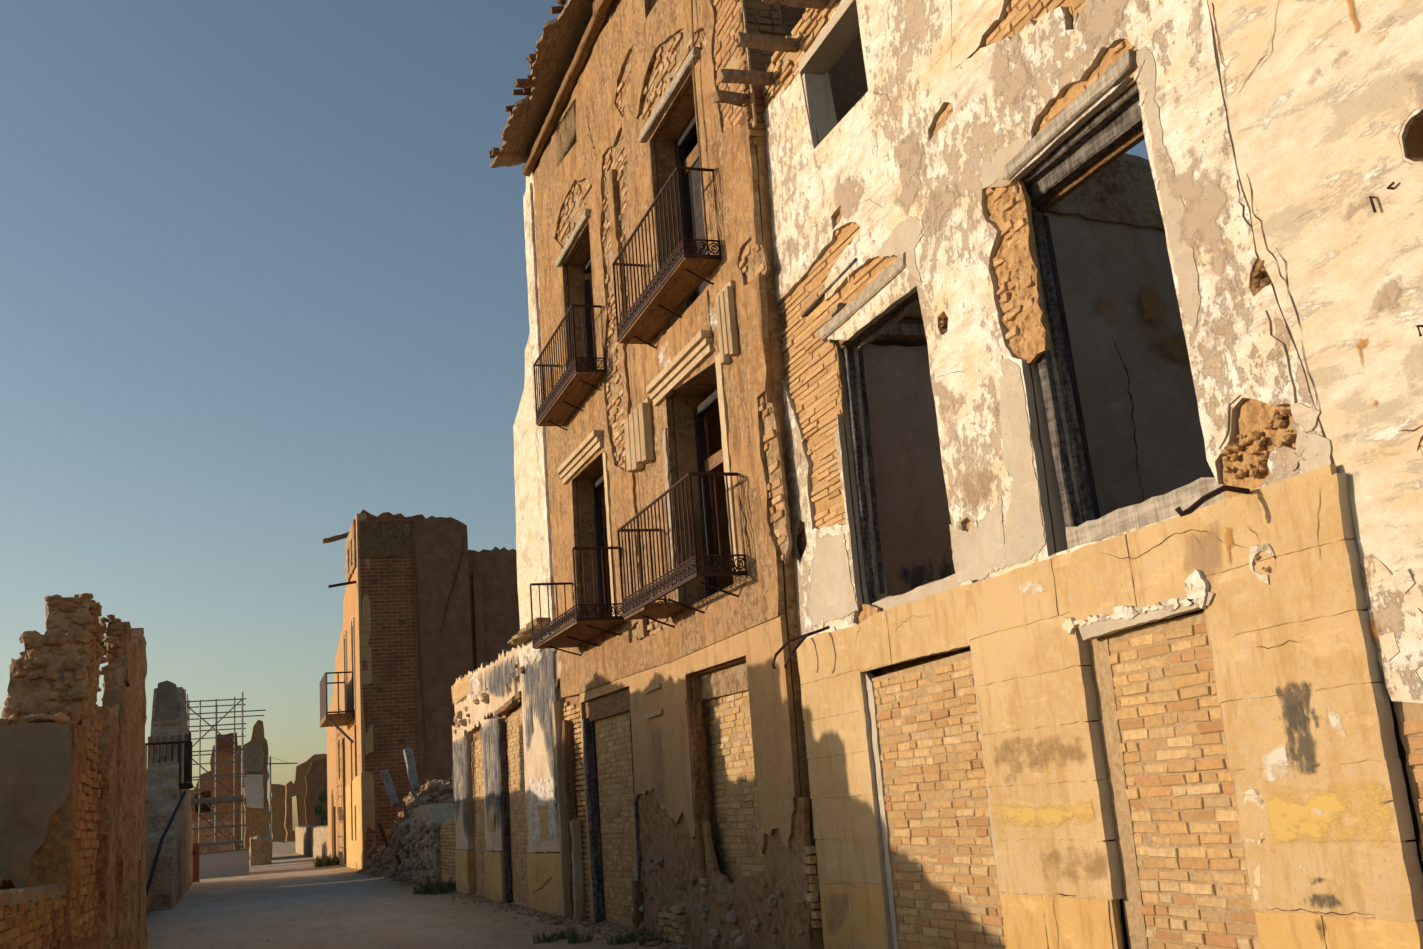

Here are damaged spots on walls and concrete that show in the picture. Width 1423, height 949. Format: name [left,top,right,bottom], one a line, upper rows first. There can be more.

crack [1212,1,1279,122]
corrosion [1347,0,1359,31]
spalling [1398,74,1423,165]
flaking render [903,0,1273,590]
crack [1237,176,1320,417]
flaking render [759,103,953,628]
flaking render [1221,398,1333,500]
crack [1104,526,1261,559]
peeling [451,644,559,846]